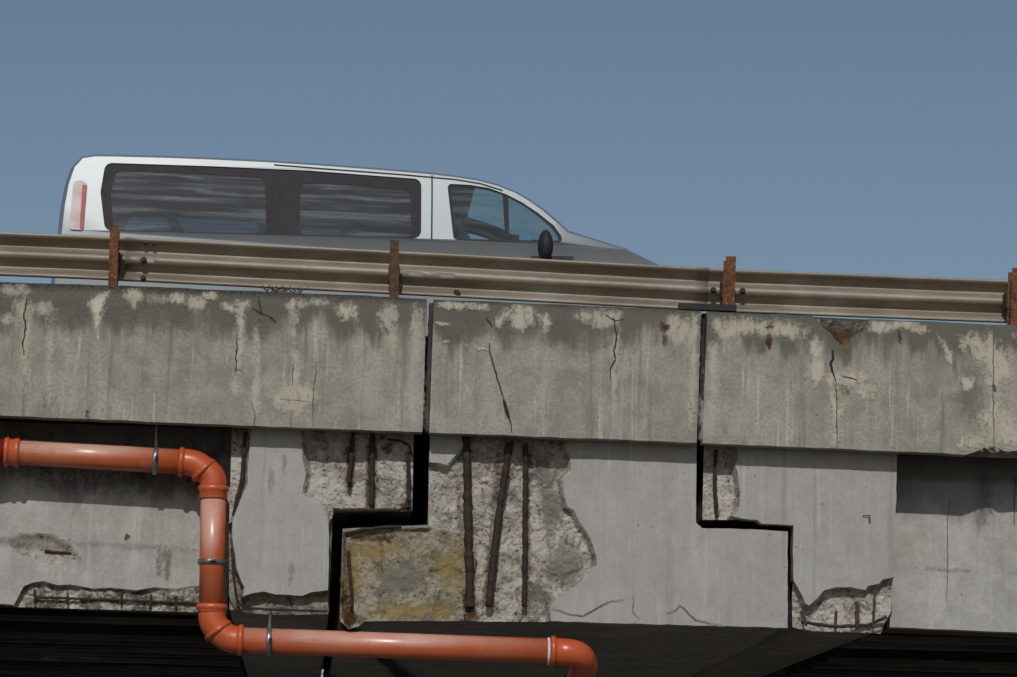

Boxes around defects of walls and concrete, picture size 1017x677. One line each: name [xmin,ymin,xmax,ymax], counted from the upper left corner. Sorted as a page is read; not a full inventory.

water stain [87,291,110,340]
water stain [123,288,358,422]
crack [485,317,512,431]
water stain [495,305,552,333]
water stain [665,314,876,446]
water stain [938,333,1017,451]
spalling [8,533,83,565]
spalling [14,581,199,612]
spalling [225,428,328,615]
spalling [300,430,414,523]
spalling [340,436,597,629]
spalling [792,577,894,634]